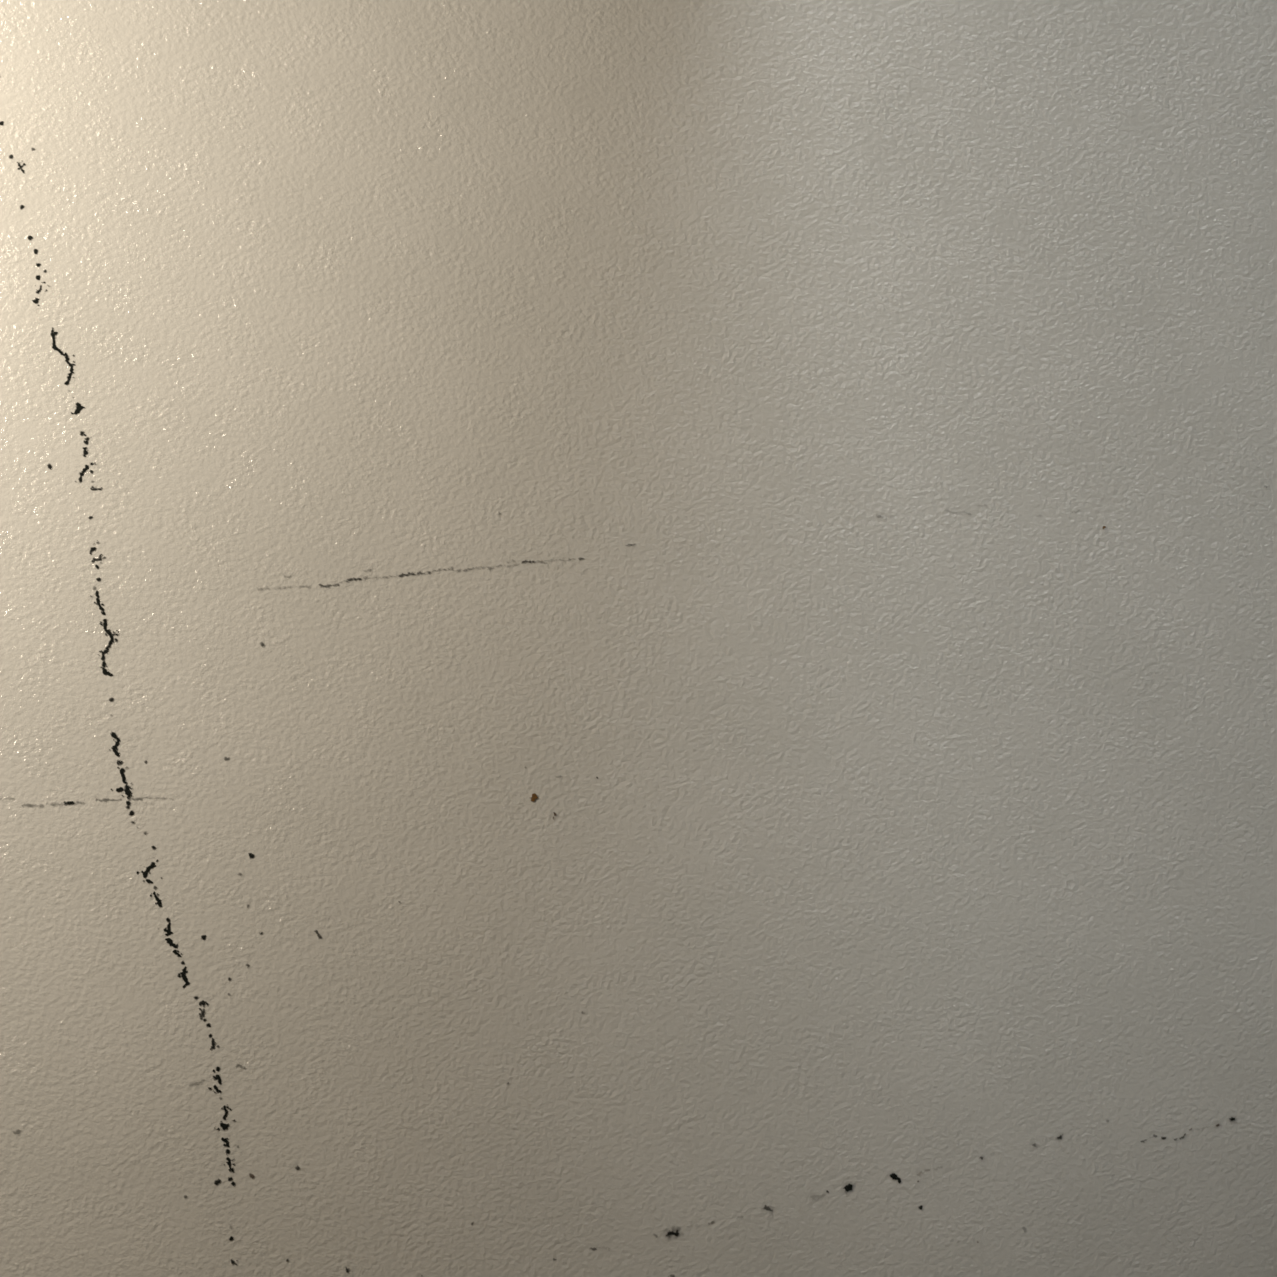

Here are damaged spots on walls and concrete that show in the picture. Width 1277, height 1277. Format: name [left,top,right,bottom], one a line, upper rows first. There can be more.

crack [9,148,35,173]
crack [20,205,119,701]
crack [109,732,235,1186]
crack [826,1184,853,1193]
crack [890,1173,919,1183]